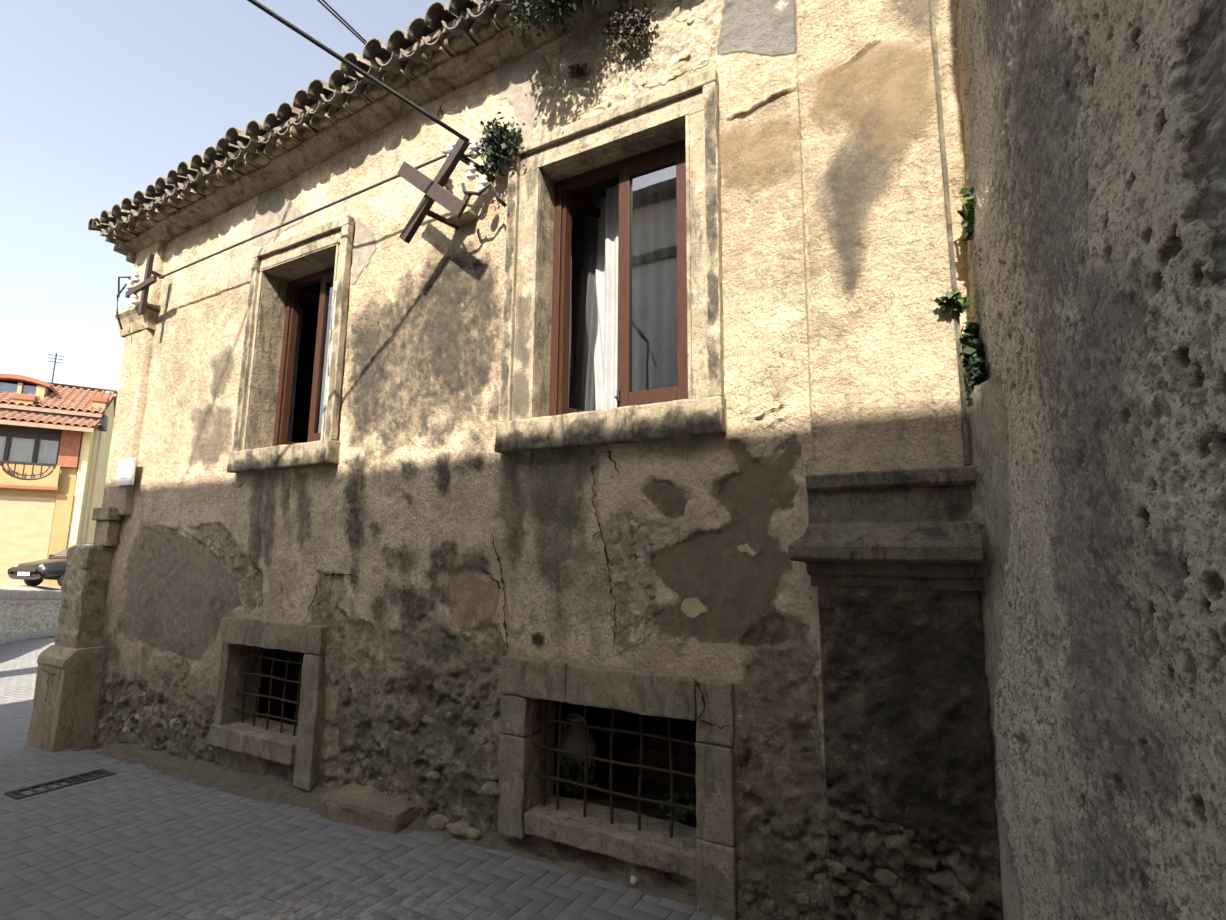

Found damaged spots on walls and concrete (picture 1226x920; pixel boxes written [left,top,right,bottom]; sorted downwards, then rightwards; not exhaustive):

water stain [706,193,717,250]
water stain [707,269,719,323]
water stain [704,86,799,184]
water stain [813,43,934,286]
water stain [191,286,310,566]
water stain [315,229,529,590]
water stain [495,415,607,584]
crack [590,448,620,650]
water stain [625,407,720,440]
peeling [681,597,708,618]
peeling [737,543,756,557]
spalling [309,564,509,841]